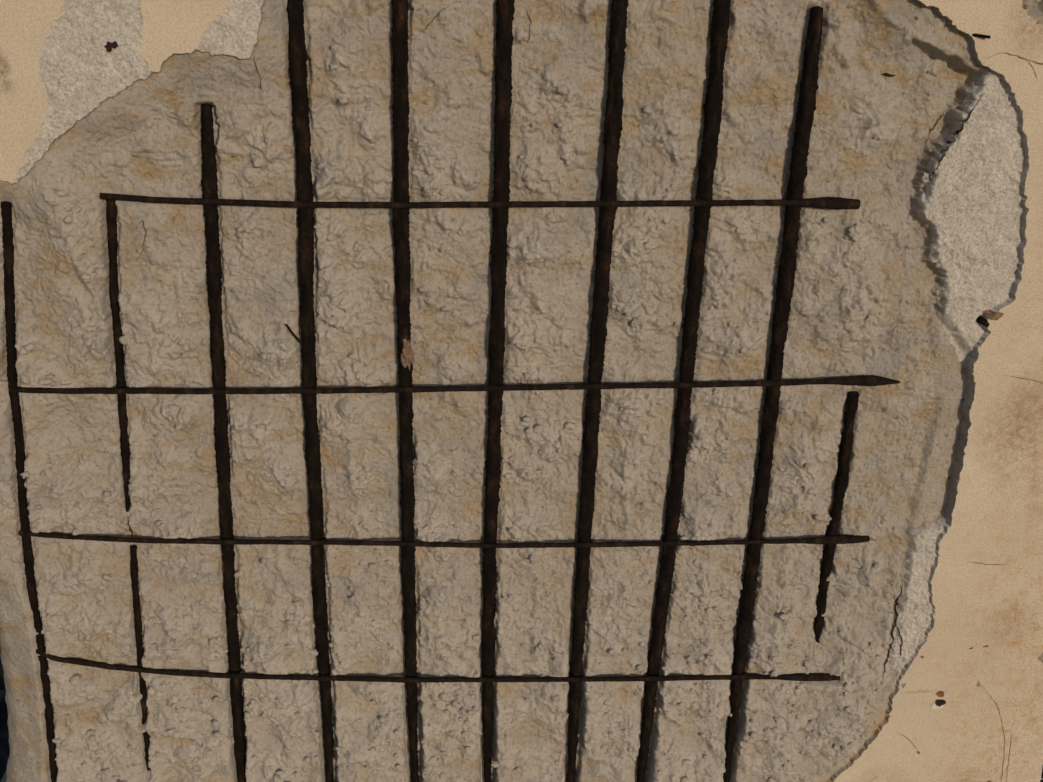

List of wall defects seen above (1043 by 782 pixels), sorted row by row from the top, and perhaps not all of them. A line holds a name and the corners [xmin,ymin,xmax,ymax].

spalling [1022,0,1043,26]
crack [988,52,1043,78]
crack [926,93,985,182]
spalling [0,0,612,782]
corrosion [401,338,414,370]
spalling [575,0,1029,782]
crack [883,584,903,675]